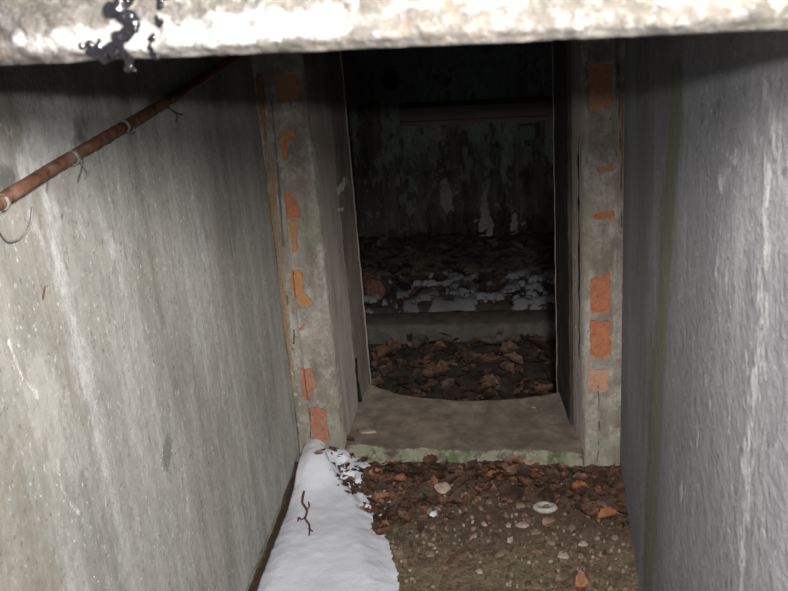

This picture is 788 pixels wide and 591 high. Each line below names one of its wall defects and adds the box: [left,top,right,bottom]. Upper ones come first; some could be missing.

corrosion [0,54,250,214]
peeling [473,191,499,236]